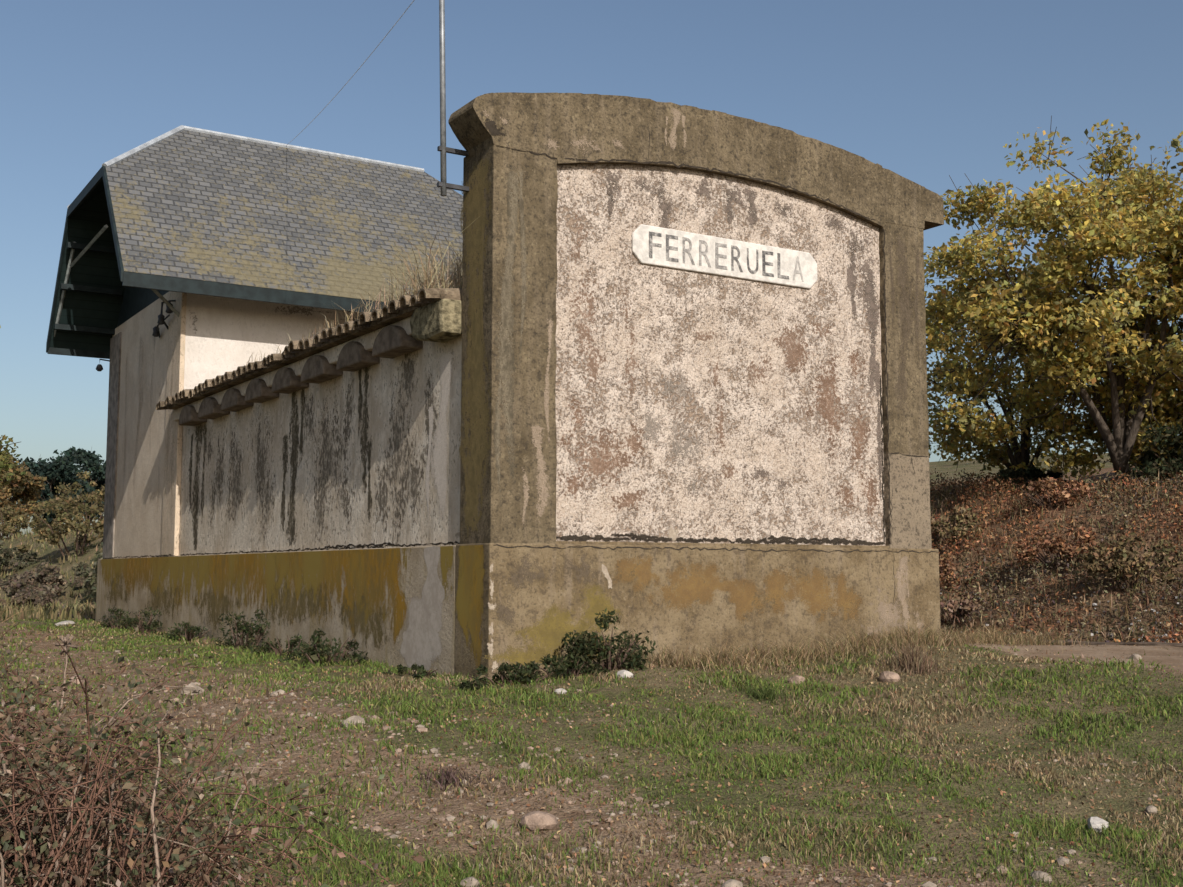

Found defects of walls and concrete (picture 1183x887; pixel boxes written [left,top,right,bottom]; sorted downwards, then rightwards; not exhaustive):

damp [188,353,441,646]
peeling [556,210,652,512]
damp [440,165,920,661]
peeling [693,330,791,489]
peeling [745,316,879,524]